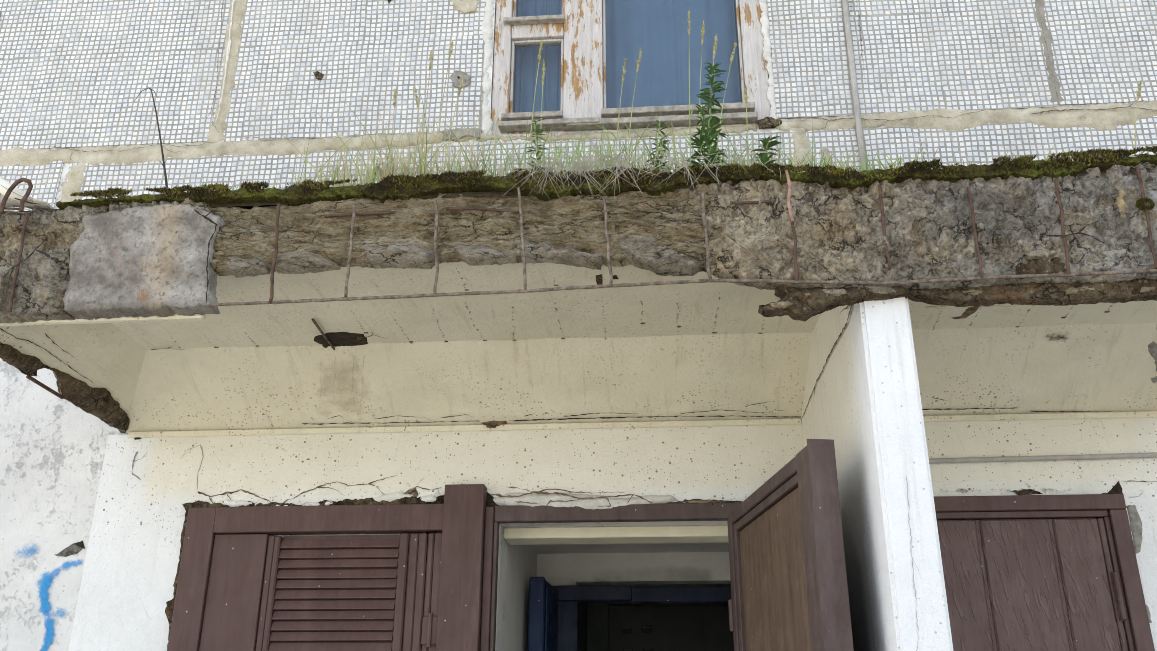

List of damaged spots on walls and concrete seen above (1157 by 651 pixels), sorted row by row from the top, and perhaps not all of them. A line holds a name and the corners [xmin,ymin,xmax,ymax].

spalling [0,146,1157,323]
spalling [311,318,368,350]
peeling [1148,328,1157,383]
spalling [0,344,141,440]
crack [182,445,441,505]
crack [491,487,652,507]